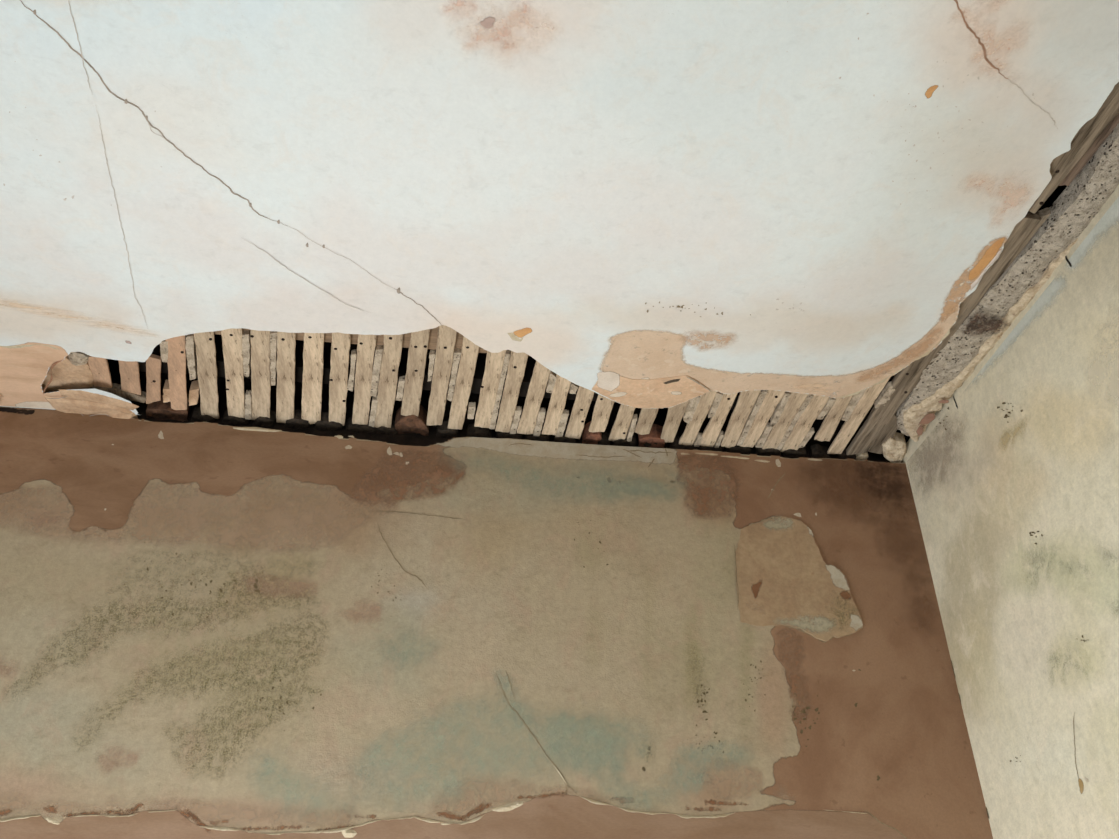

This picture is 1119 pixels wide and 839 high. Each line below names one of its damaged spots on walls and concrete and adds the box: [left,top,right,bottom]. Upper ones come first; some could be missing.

crack [20,0,443,326]
flaking render [882,123,1119,463]
crack [954,0,1058,129]
leakage [16,571,309,683]
leakage [98,617,326,769]
peeling [0,237,1007,839]